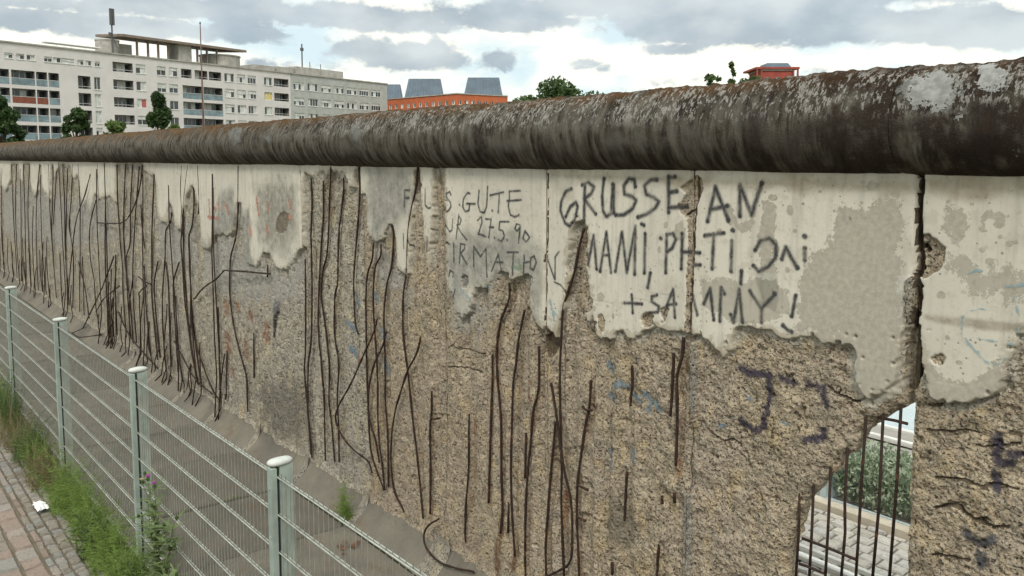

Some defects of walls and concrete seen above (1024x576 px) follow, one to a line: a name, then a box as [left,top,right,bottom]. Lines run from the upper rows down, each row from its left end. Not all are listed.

crack [908,177,932,326]
spalling [0,162,1024,576]
crack [933,476,1020,529]